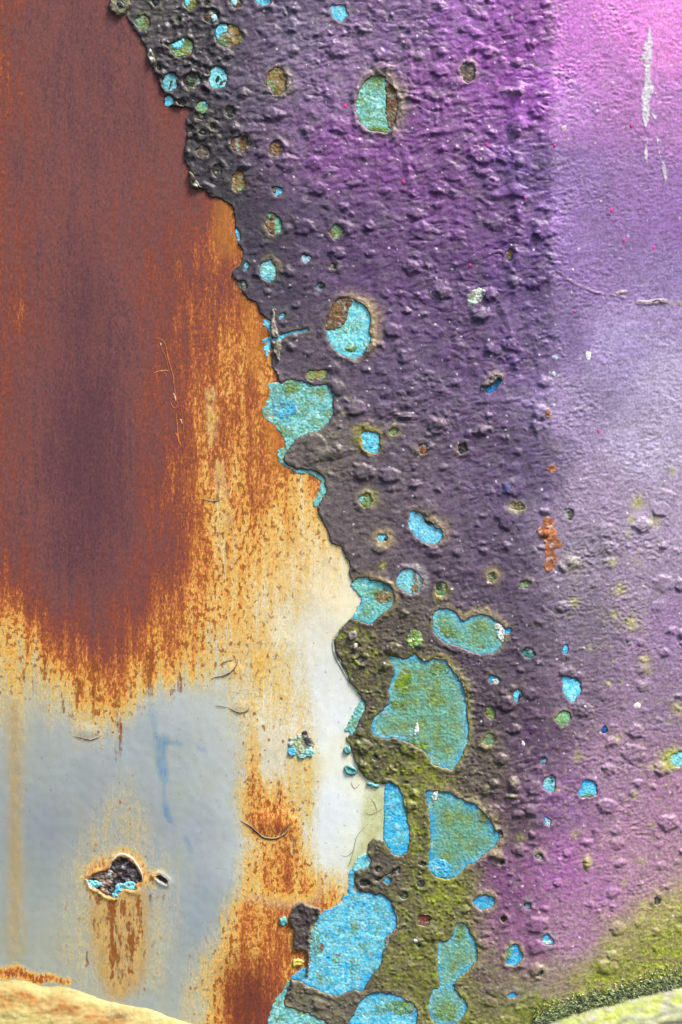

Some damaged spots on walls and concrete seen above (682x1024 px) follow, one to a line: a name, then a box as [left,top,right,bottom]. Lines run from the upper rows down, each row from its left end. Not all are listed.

peeling [325,298,354,330]
peeling [262,380,334,507]
corrosion [0,0,349,1024]
corrosion [536,516,562,572]
peeling [348,578,394,663]
peeling [432,609,505,655]
spalling [288,730,315,759]
peeling [343,654,469,776]
hole [85,853,143,898]
peeling [366,781,410,856]
peeling [417,791,503,887]
peeling [267,853,479,1024]